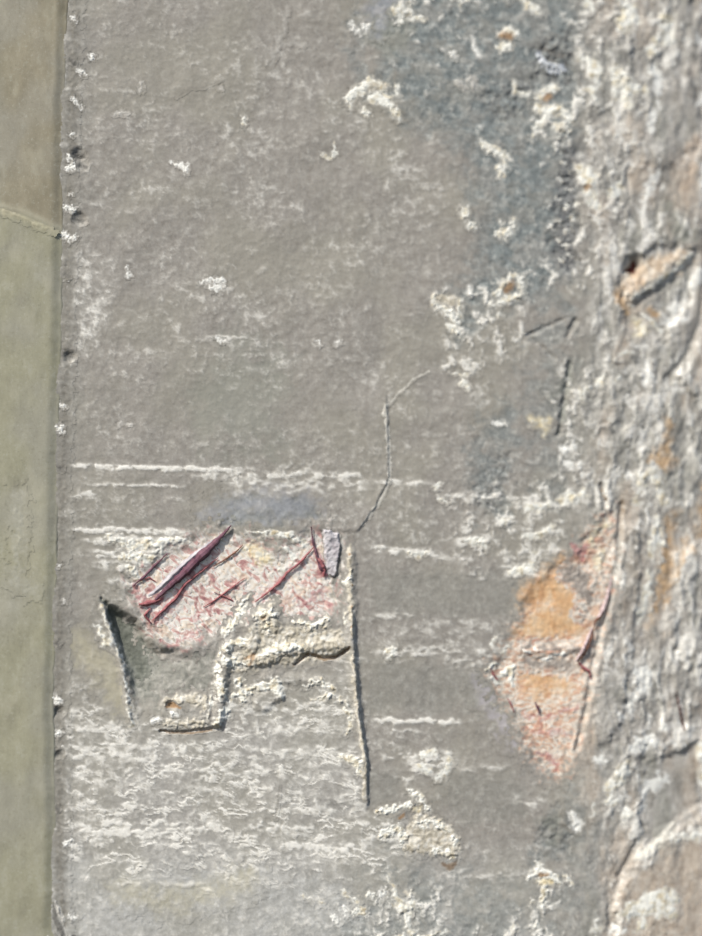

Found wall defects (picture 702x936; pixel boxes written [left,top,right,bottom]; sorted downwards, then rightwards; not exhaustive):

crack [360,369,431,527]
leakage [185,468,337,617]
peeling [496,497,557,580]
leakage [124,559,251,649]
leakage [554,558,602,627]
spalling [89,590,233,736]
peeling [483,634,567,690]
leakage [461,662,583,778]
leakage [528,800,577,862]
leakage [96,849,272,929]